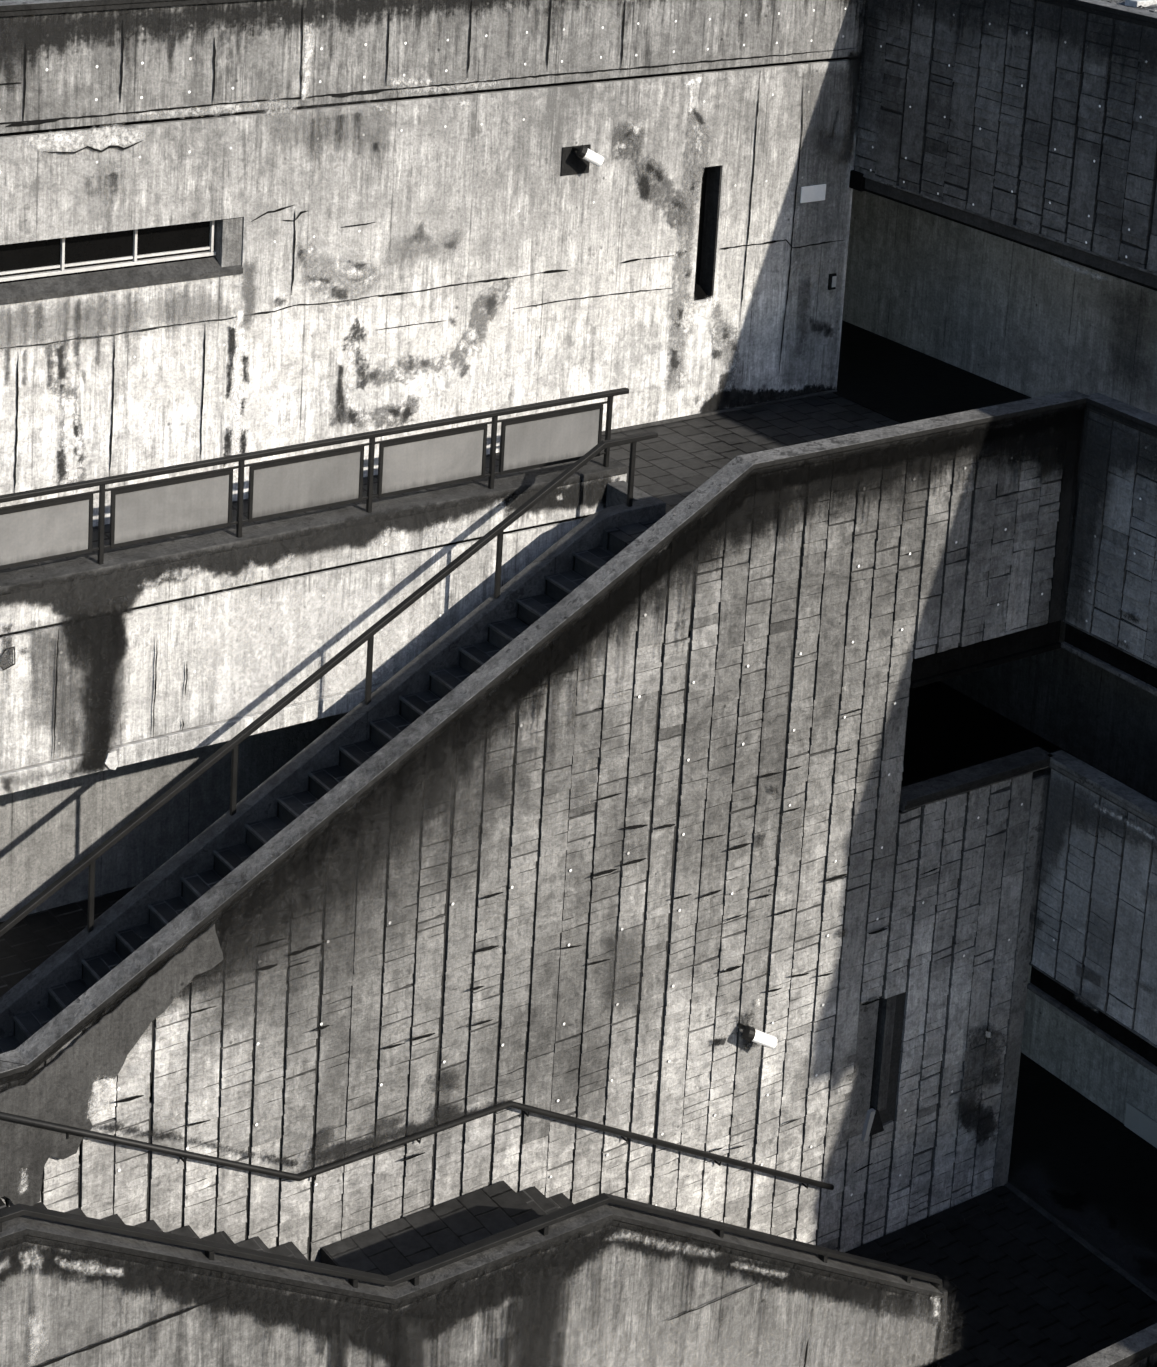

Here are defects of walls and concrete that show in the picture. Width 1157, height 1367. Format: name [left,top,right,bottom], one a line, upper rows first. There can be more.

spalling [29,126,142,154]
water stain [0,0,587,83]
water stain [819,0,1157,163]
water stain [408,225,458,259]
crack [0,205,674,493]
water stain [700,384,837,413]
water stain [0,405,1157,1093]
peeling [0,924,223,1206]
water stain [958,1026,1008,1146]
water stain [0,1223,943,1367]